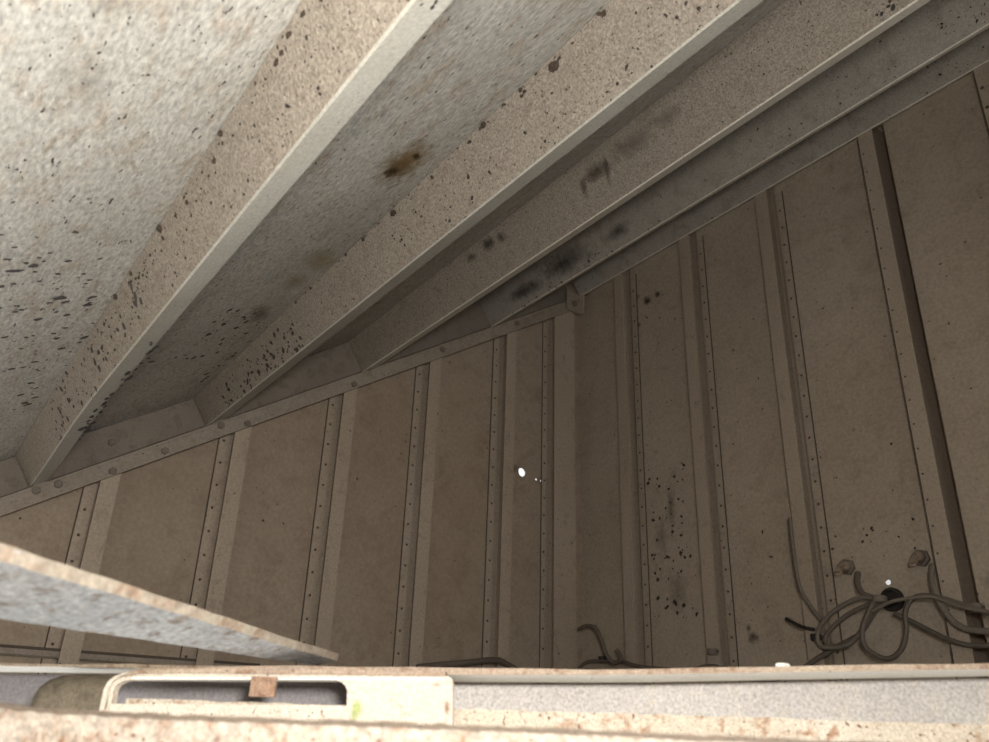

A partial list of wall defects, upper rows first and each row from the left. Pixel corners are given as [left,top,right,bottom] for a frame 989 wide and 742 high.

corrosion [388,148,420,175]
damp [647,462,692,582]